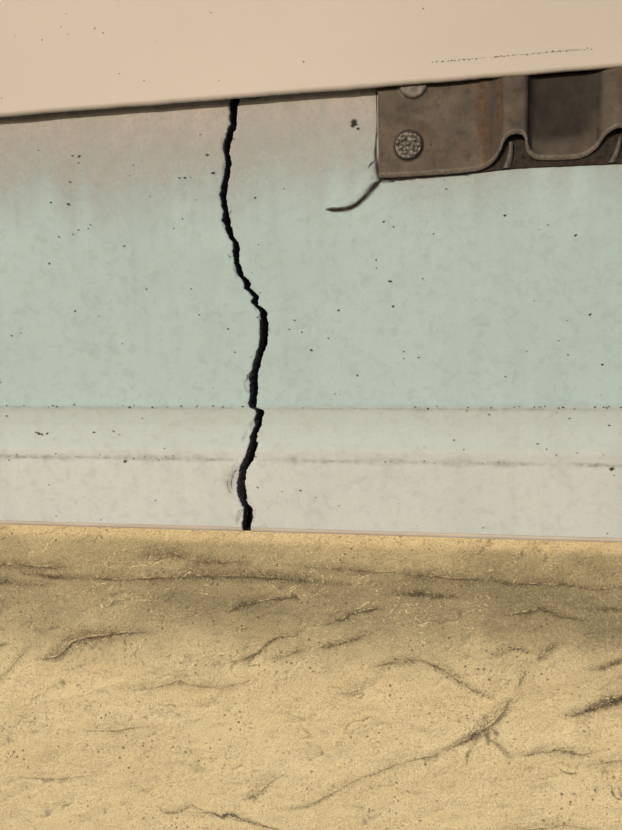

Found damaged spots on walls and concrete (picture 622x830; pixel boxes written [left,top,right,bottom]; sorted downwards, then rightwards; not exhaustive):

crack [220,97,269,531]
crack [326,89,434,212]